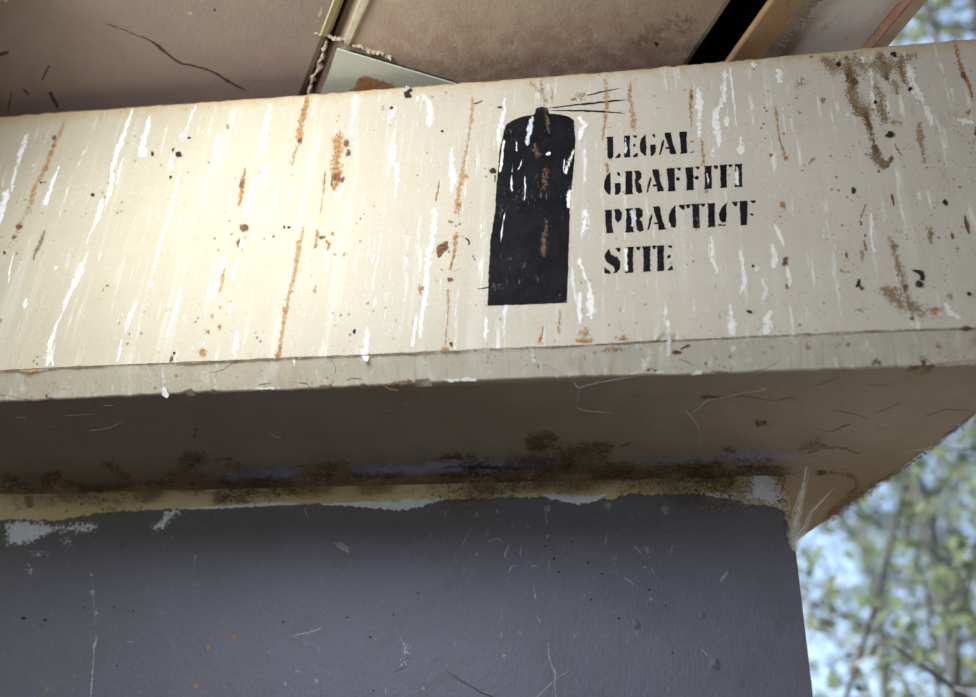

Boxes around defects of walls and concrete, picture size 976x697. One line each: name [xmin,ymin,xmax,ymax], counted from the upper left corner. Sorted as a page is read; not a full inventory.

rust [3,121,65,255]
crack [108,24,247,90]
rust [237,166,246,205]
rust [288,95,310,176]
rust [320,129,344,213]
rust [454,96,483,218]
water stain [844,54,934,162]
rust [274,222,347,360]
rust [434,232,460,353]